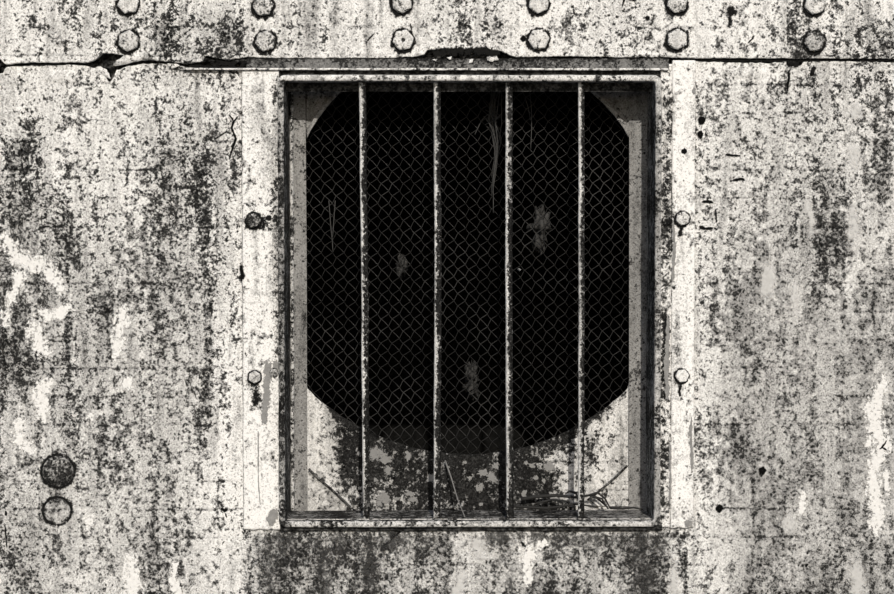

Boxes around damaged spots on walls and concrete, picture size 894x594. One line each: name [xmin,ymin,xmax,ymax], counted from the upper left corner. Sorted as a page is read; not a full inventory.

crack [0,50,247,79]
leakage [0,138,77,370]
leakage [761,265,776,297]
leakage [97,288,132,362]
leakage [10,377,57,455]
leakage [863,374,893,537]
leakage [781,490,807,532]
leakage [119,551,145,594]
leakage [168,557,182,594]
leakage [243,530,445,594]
leakage [471,531,679,594]
leakage [847,560,865,594]